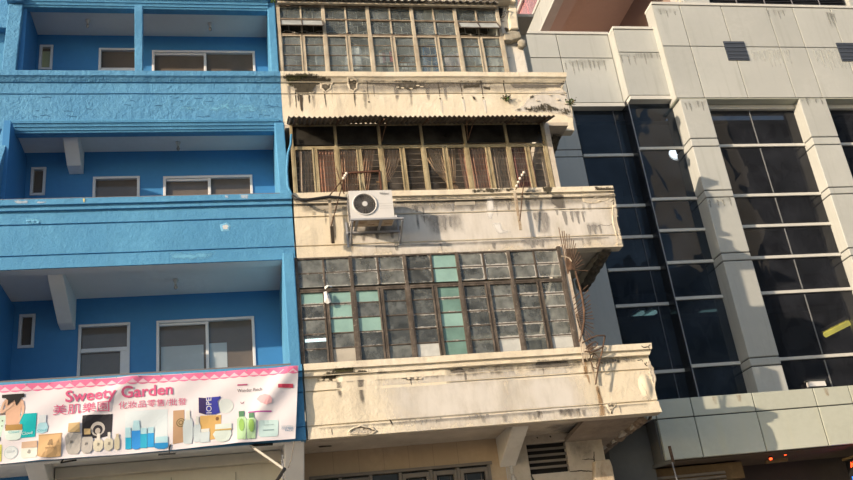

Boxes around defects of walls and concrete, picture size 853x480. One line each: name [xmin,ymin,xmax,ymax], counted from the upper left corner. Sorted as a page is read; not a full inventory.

water stain [283,73,331,111]
water stain [358,81,490,112]
water stain [503,80,564,91]
peeling [517,90,571,116]
water stain [397,188,544,248]
water stain [522,187,602,238]
water stain [319,368,369,401]
water stain [451,367,513,379]
spalling [347,425,378,436]